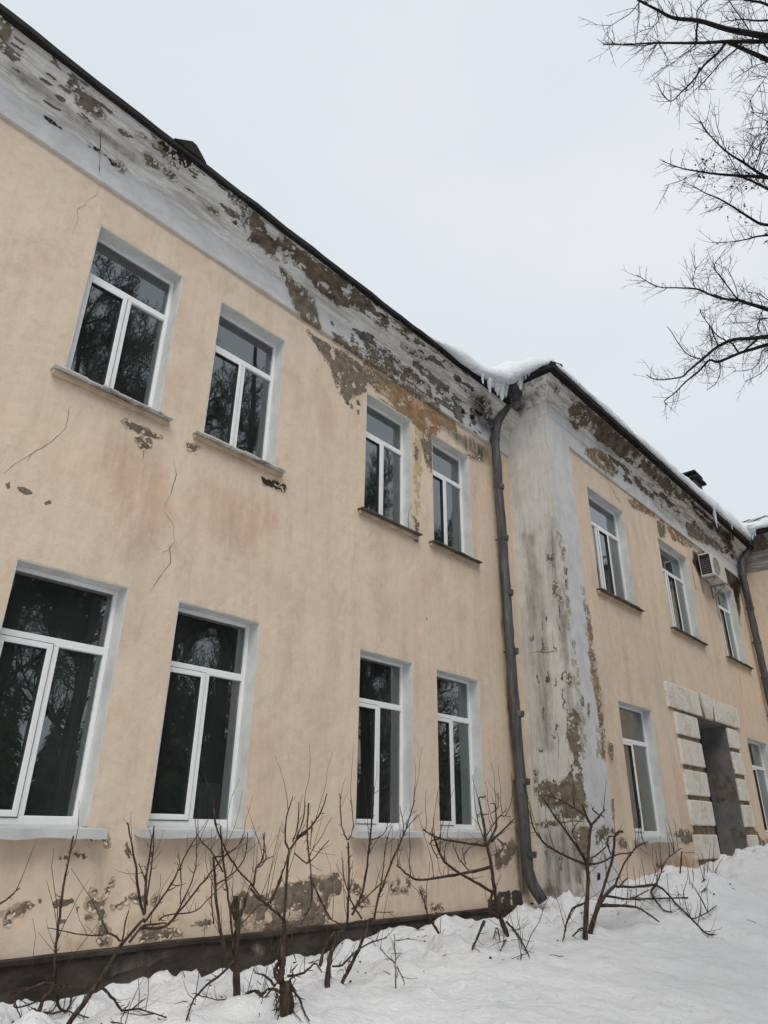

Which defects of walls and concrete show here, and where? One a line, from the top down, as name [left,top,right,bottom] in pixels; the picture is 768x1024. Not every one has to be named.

spalling [0,15,26,73]
spalling [39,56,115,129]
spalling [118,128,205,193]
spalling [201,182,494,543]
spalling [120,417,163,451]
spalling [553,382,735,559]
crack [151,464,177,591]
spalling [529,530,628,884]
spalling [0,876,161,948]
spalling [138,918,213,944]
spalling [233,871,371,933]
spalling [488,890,523,907]